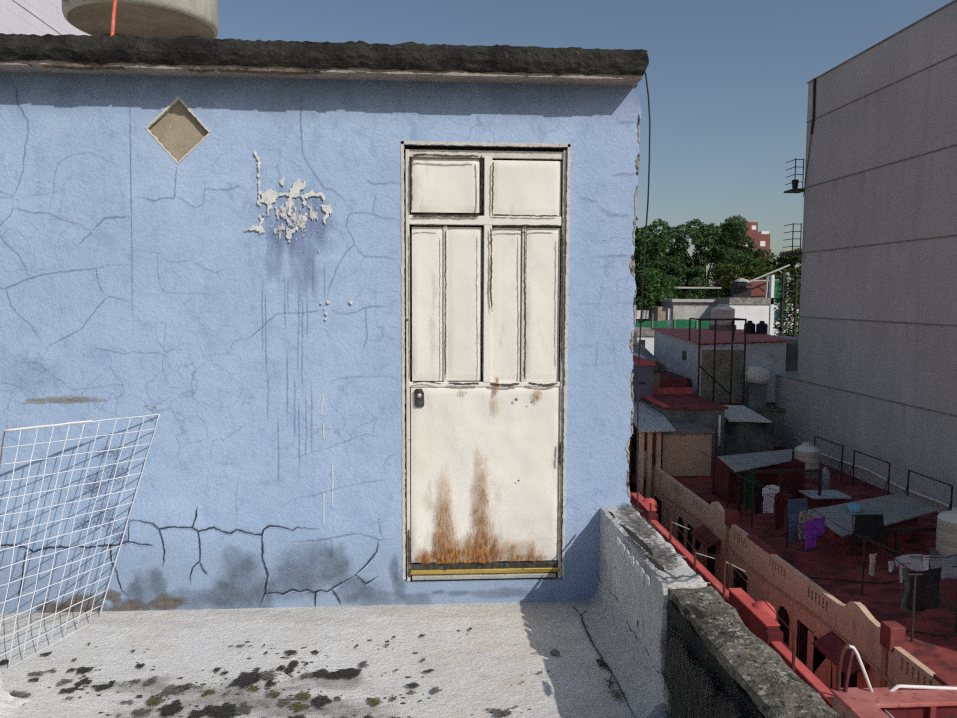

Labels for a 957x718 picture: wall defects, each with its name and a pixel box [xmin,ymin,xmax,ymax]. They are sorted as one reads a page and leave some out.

peeling [244,151,333,242]
crack [0,506,379,607]
corrosion [416,491,543,564]
crack [574,607,635,718]